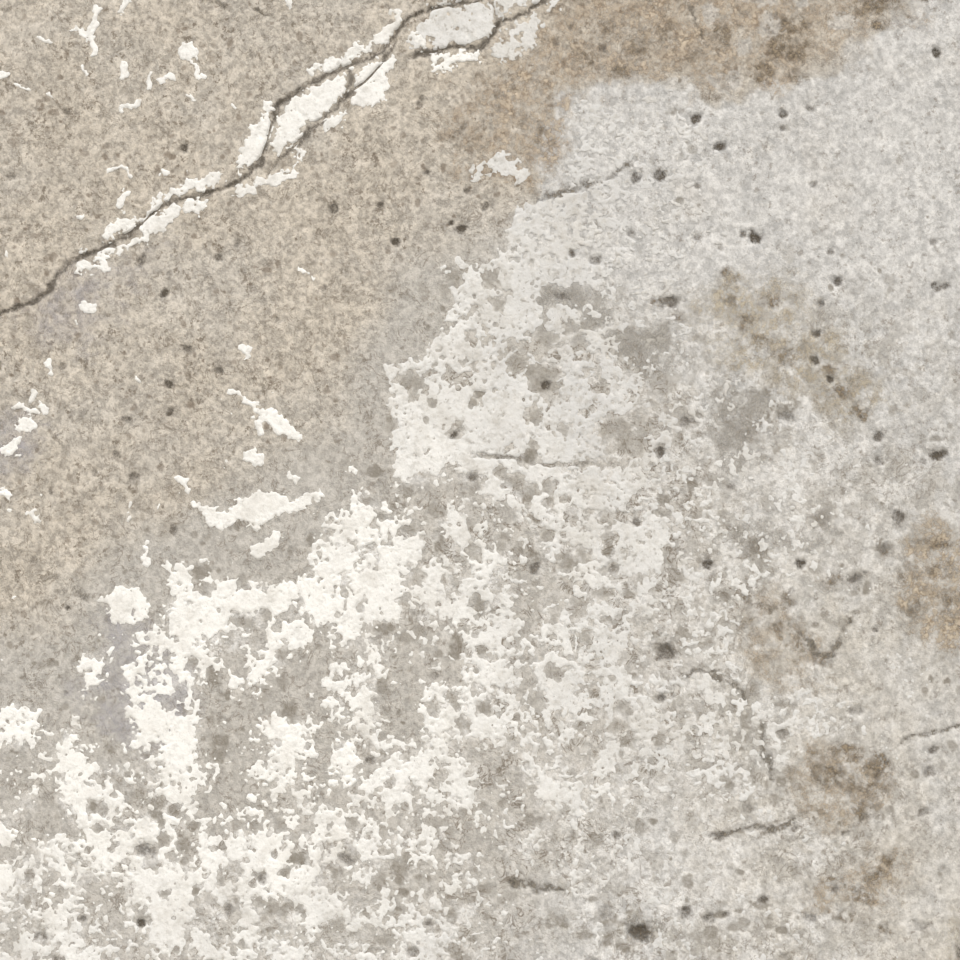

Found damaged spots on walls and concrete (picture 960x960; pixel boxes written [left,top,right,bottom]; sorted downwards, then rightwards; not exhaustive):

crack [0,0,547,316]